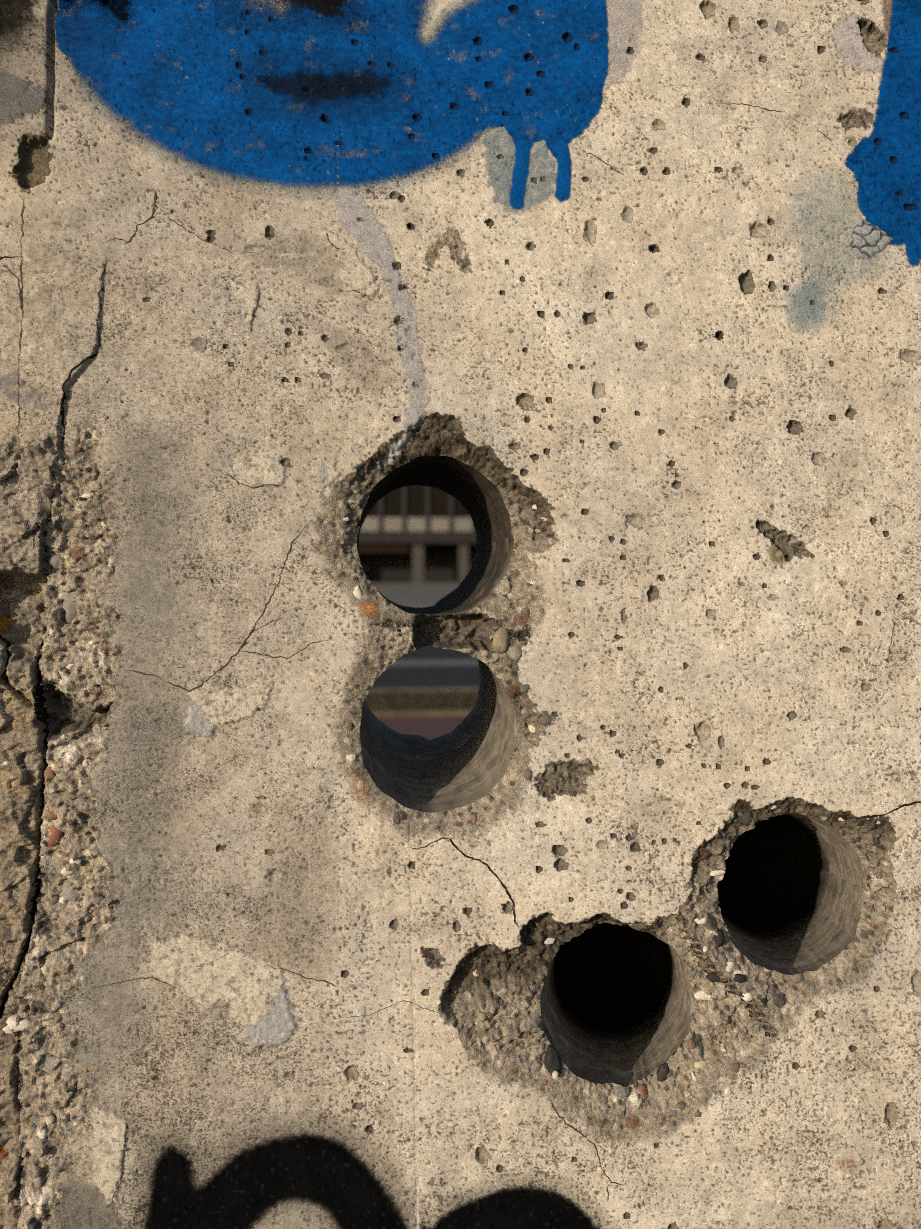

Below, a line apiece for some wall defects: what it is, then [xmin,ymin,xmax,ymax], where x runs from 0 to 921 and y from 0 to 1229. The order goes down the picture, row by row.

spalling [11,133,53,194]
crack [60,191,232,445]
crack [125,528,328,692]
spalling [312,412,599,836]
crack [0,636,49,1018]
crack [407,837,521,929]
crack [827,801,921,822]
spalling [421,797,897,1142]
crack [15,1107,23,1213]